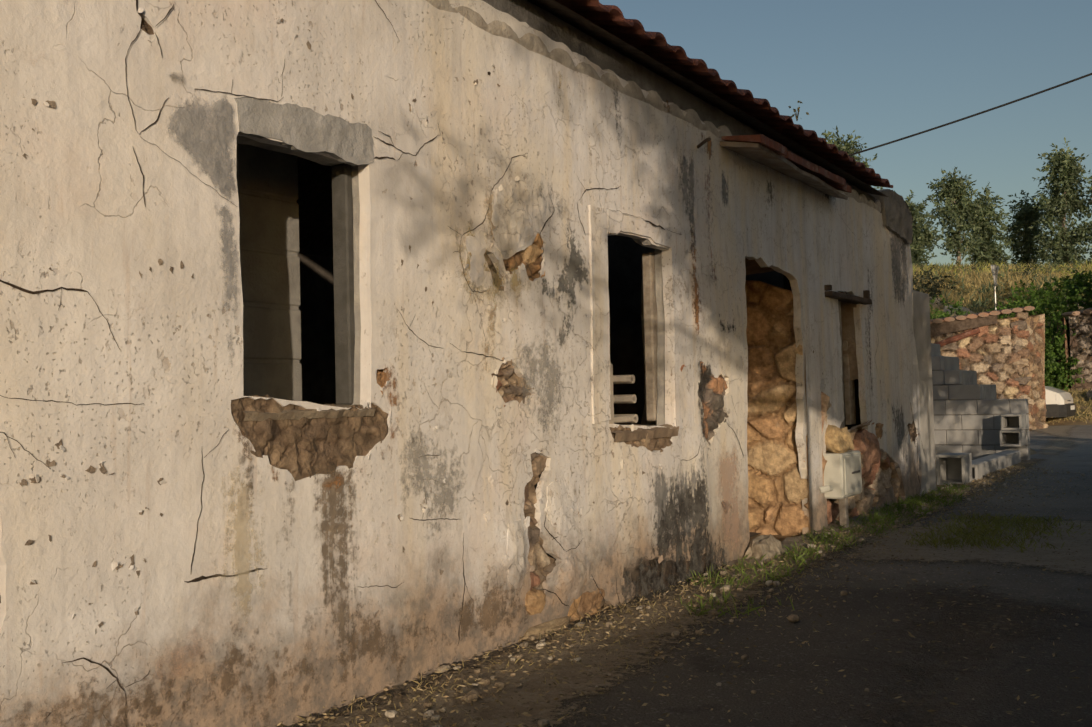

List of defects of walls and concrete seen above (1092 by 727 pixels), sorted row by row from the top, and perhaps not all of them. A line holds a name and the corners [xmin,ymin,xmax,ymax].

crack [125,0,236,206]
crack [373,124,440,160]
water stain [168,98,236,310]
crack [0,280,121,351]
spalling [231,369,392,485]
spalling [491,357,534,408]
spalling [698,362,729,445]
water stain [313,470,436,681]
spalling [523,448,558,590]
water stain [622,460,730,604]
crack [63,657,150,727]
water stain [44,676,172,727]